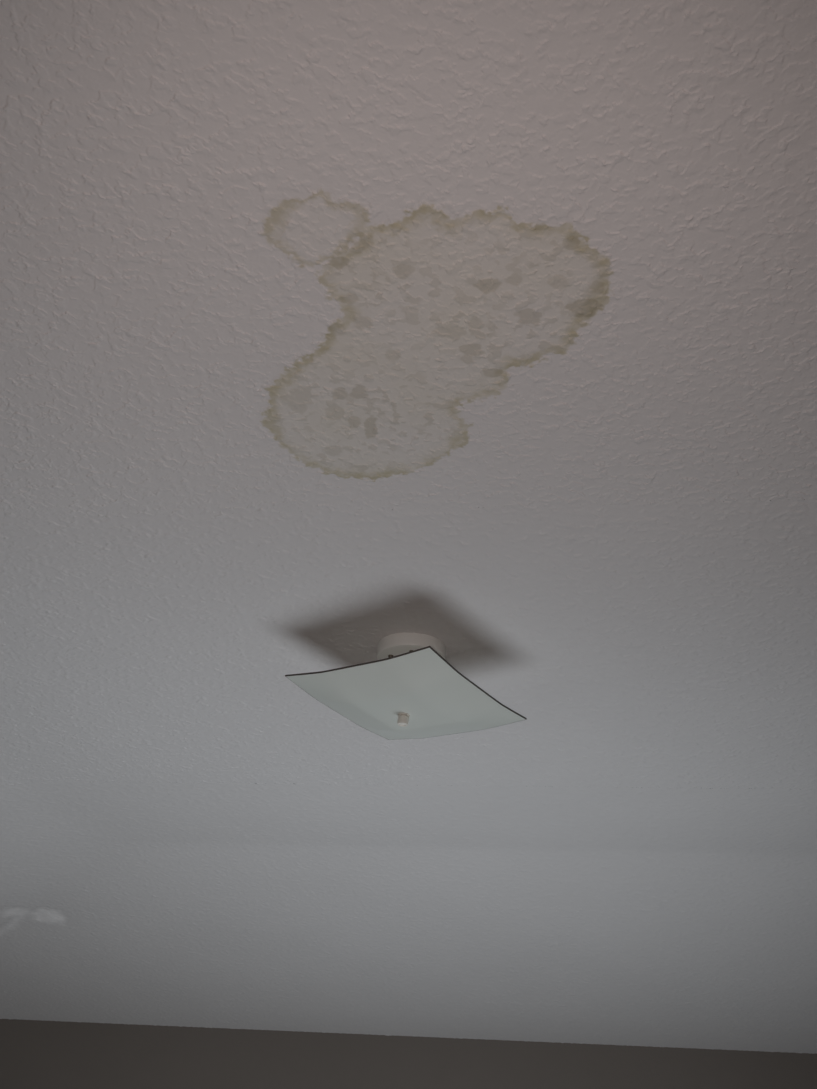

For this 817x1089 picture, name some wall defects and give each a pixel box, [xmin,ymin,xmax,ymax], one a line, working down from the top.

water stain [259,187,617,482]